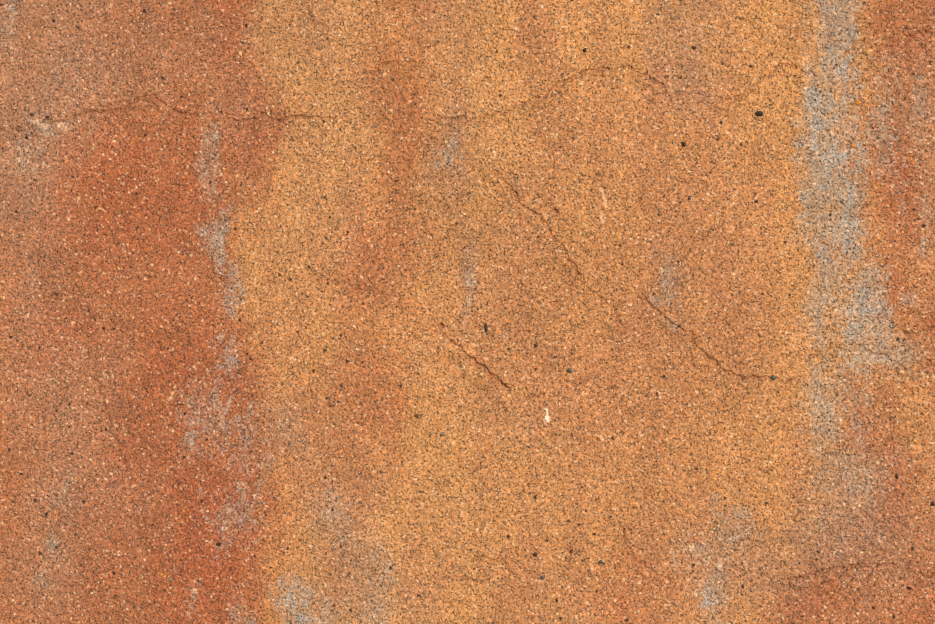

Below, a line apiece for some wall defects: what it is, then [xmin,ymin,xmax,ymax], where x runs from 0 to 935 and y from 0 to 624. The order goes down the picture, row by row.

crack [0,94,336,133]
crack [436,62,821,122]
crack [444,167,935,407]
crack [413,327,550,401]
crack [607,501,675,581]
crack [699,561,935,585]